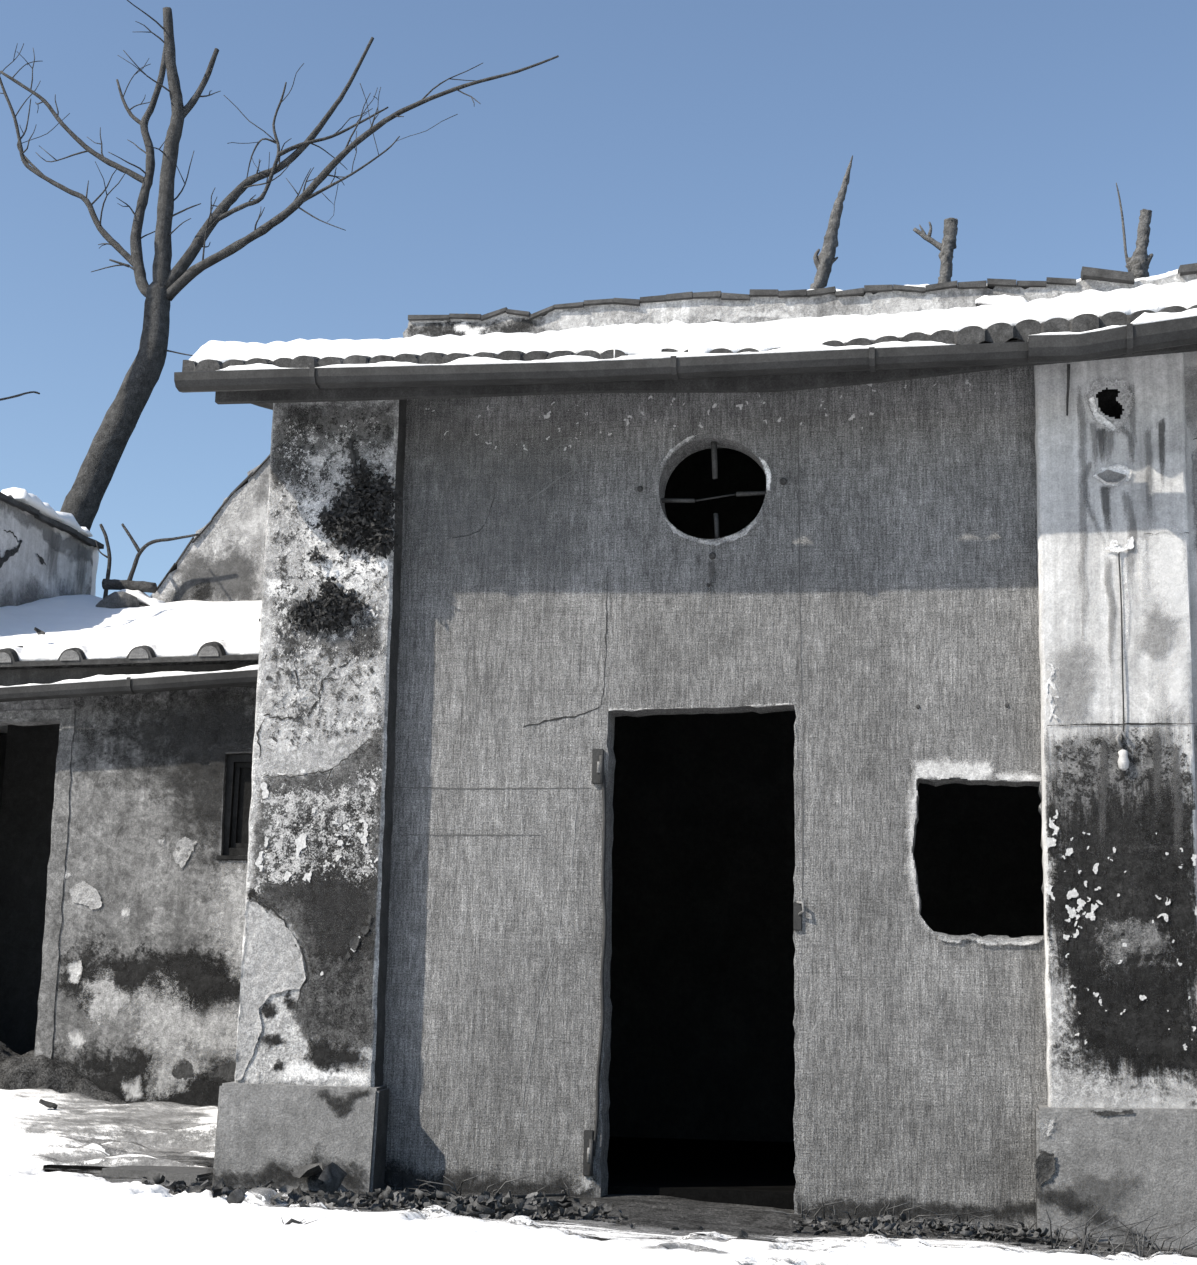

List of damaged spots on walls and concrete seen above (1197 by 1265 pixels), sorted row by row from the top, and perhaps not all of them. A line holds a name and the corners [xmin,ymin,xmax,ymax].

spalling [1086,378,1134,432]
spalling [1092,465,1132,486]
water stain [1077,386,1175,660]
spalling [0,530,22,568]
crack [523,572,608,727]
water stain [51,401,395,1117]
peeling [255,836,268,871]
peeling [282,870,312,882]
peeling [294,833,307,860]
peeling [325,817,378,868]
water stain [1044,645,1197,1105]